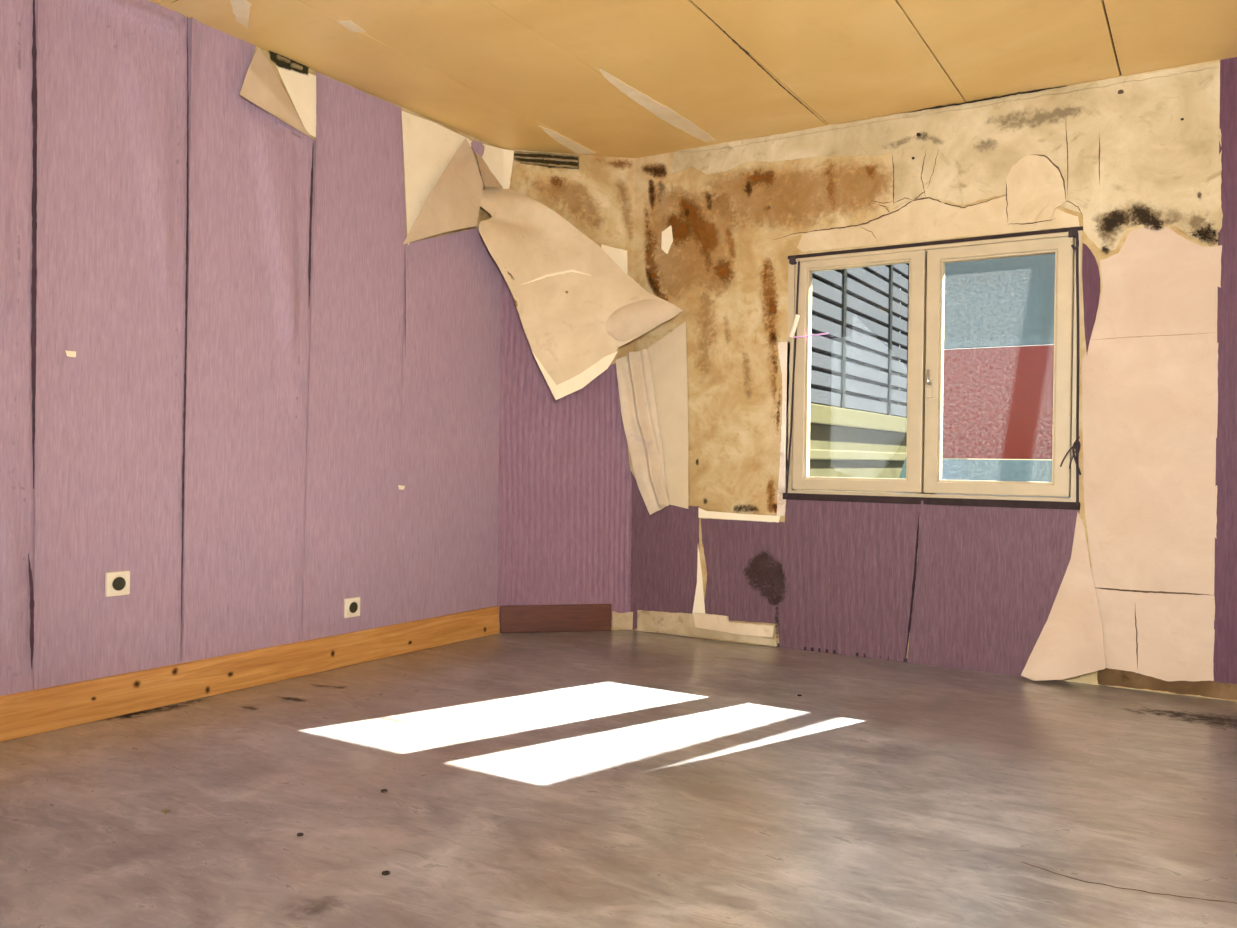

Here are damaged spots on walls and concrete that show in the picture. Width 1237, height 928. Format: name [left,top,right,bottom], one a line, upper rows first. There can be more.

spalling [269,51,309,75]
crack [904,86,1063,113]
spalling [514,151,579,169]
leakage [744,170,775,196]
crack [773,118,1083,242]
peeling [671,62,1223,252]
crack [1095,133,1103,185]
leakage [610,160,668,301]
leakage [667,193,735,282]
leakage [1096,205,1219,254]
peeling [777,342,790,516]
leakage [744,551,786,638]